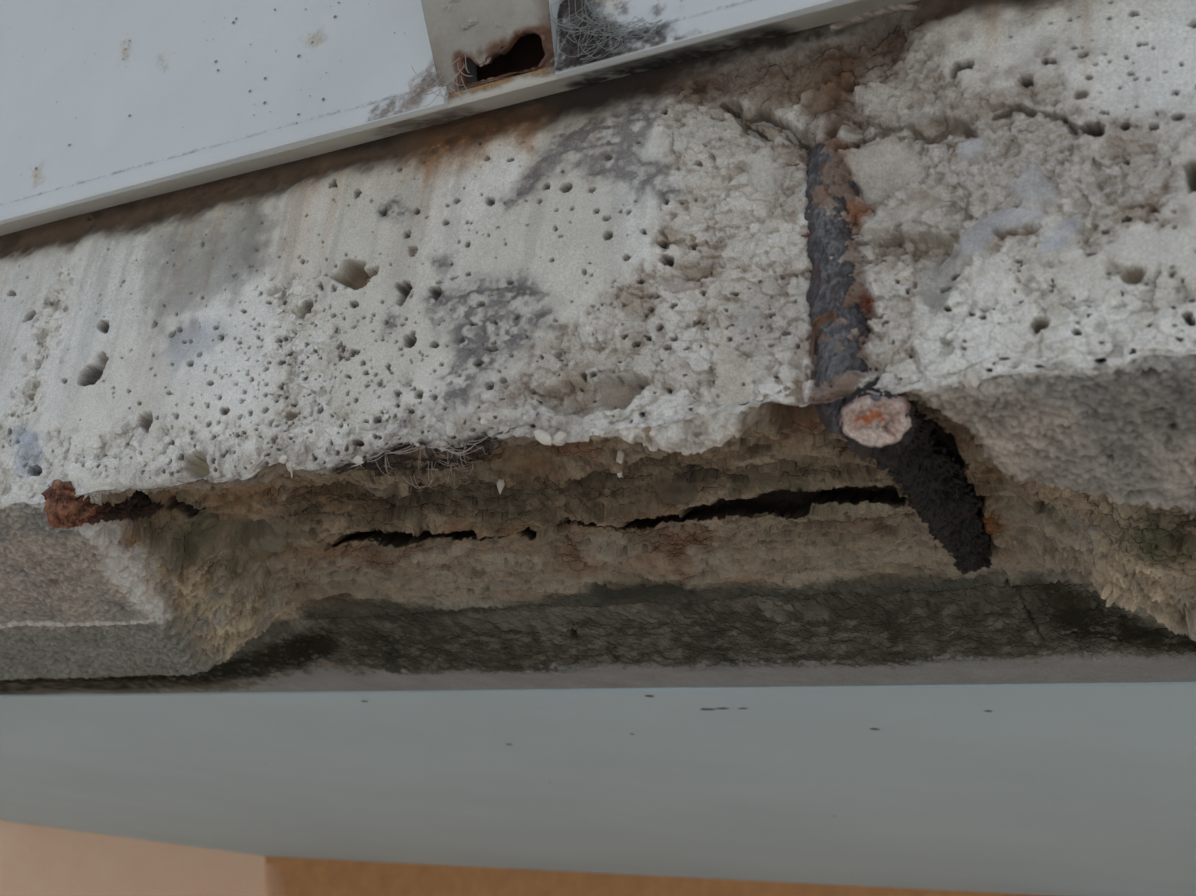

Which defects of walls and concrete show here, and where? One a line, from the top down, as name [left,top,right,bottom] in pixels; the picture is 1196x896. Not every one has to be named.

spalling [41,0,1196,664]
crack [332,530,492,547]
crack [520,463,907,540]
leakage [541,584,831,607]